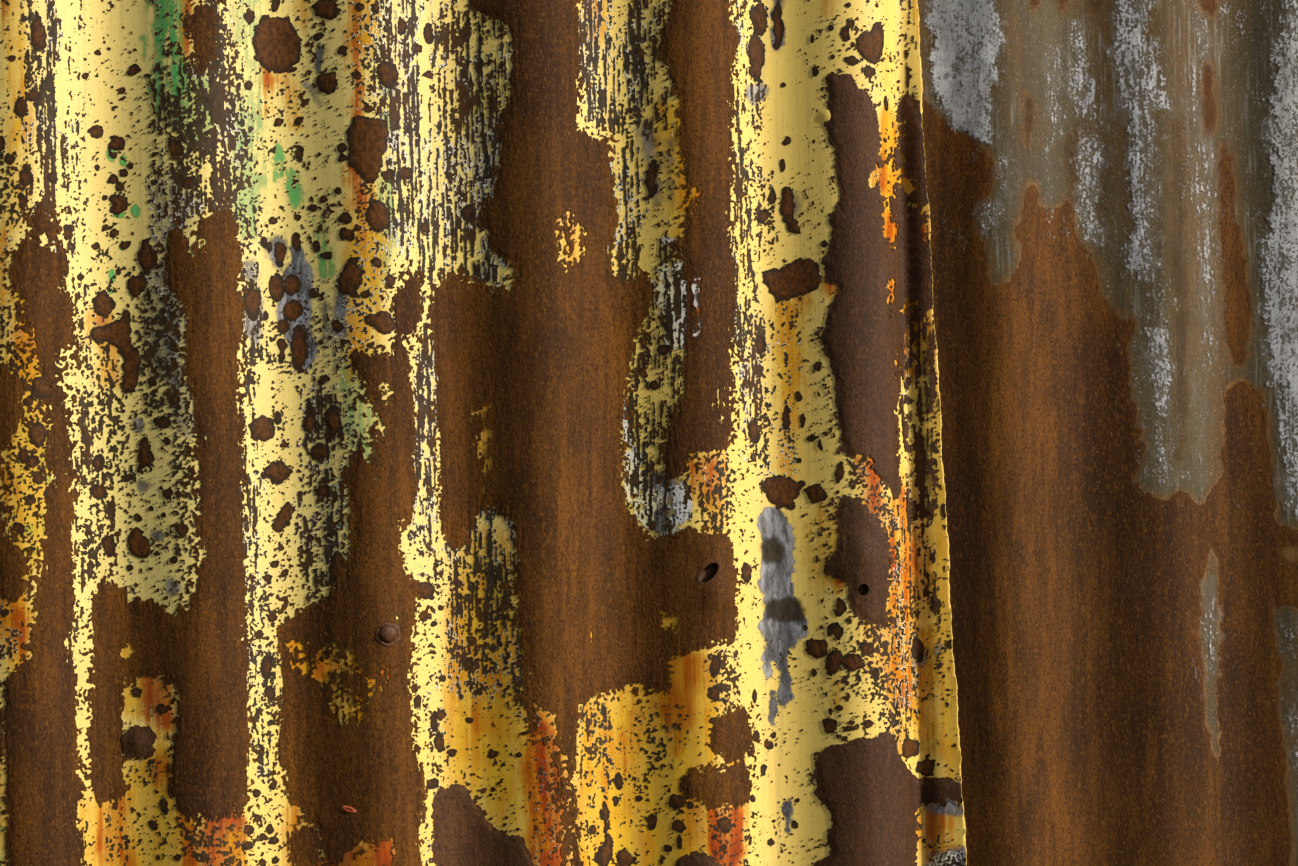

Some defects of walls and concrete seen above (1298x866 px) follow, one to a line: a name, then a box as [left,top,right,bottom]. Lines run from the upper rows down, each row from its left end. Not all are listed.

corrosion [0,0,783,866]
peeling [0,0,966,866]
corrosion [754,21,1298,866]